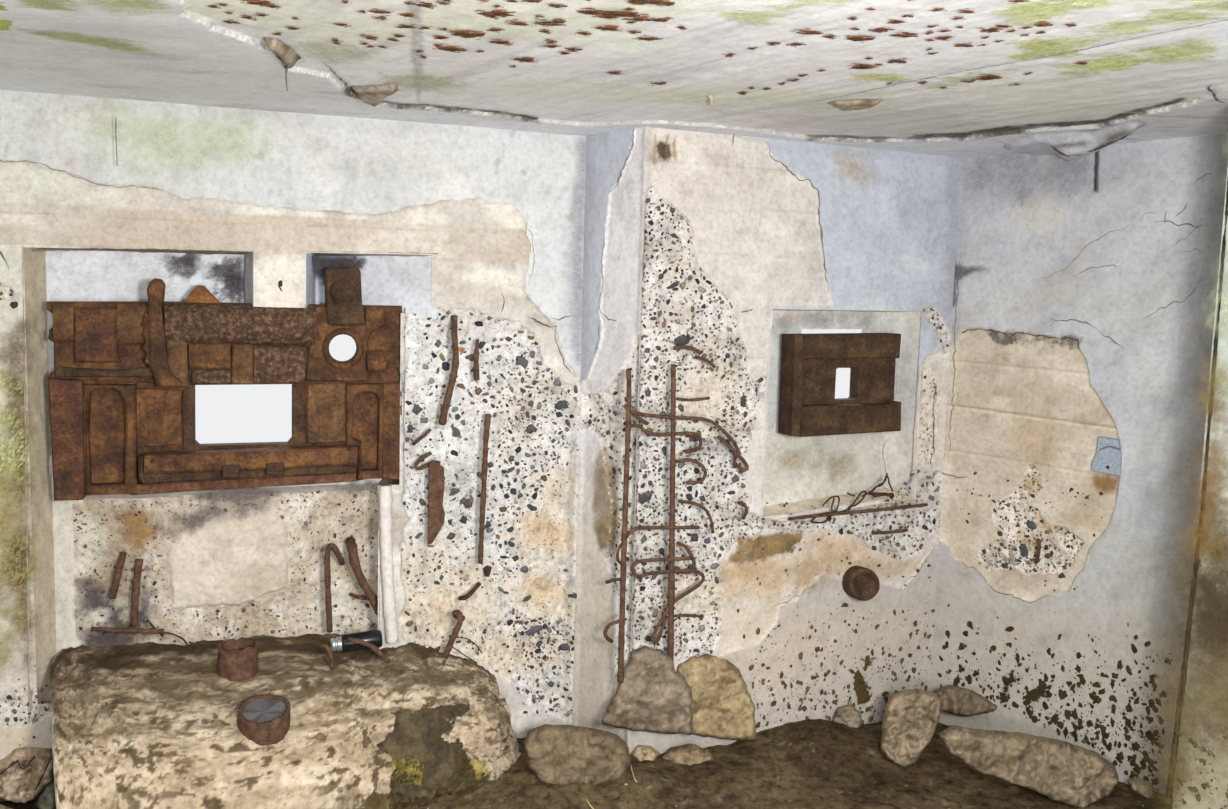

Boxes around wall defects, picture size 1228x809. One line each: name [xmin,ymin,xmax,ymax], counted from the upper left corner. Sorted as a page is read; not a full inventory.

rust [207,0,280,24]
rust [332,0,687,68]
rust [721,0,1077,69]
peeling [181,0,1228,142]
rust [738,70,826,95]
rust [961,71,1032,86]
crack [0,160,159,190]
crack [33,246,253,254]
spalling [0,127,1121,748]